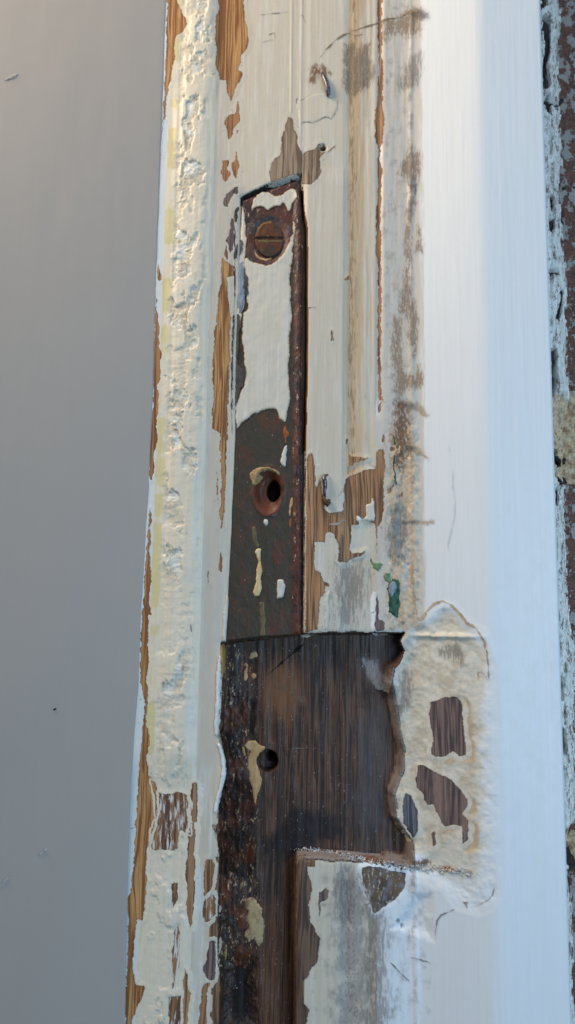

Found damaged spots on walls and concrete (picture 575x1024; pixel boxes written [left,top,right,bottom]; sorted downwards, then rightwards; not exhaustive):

peeling [161,0,193,160]
peeling [265,93,337,190]
peeling [149,260,167,485]
peeling [206,0,253,534]
peeling [301,0,401,638]
peeling [202,548,228,588]
peeling [125,504,222,1024]
peeling [397,691,475,851]
peeling [294,854,334,1024]
peeling [357,861,412,918]